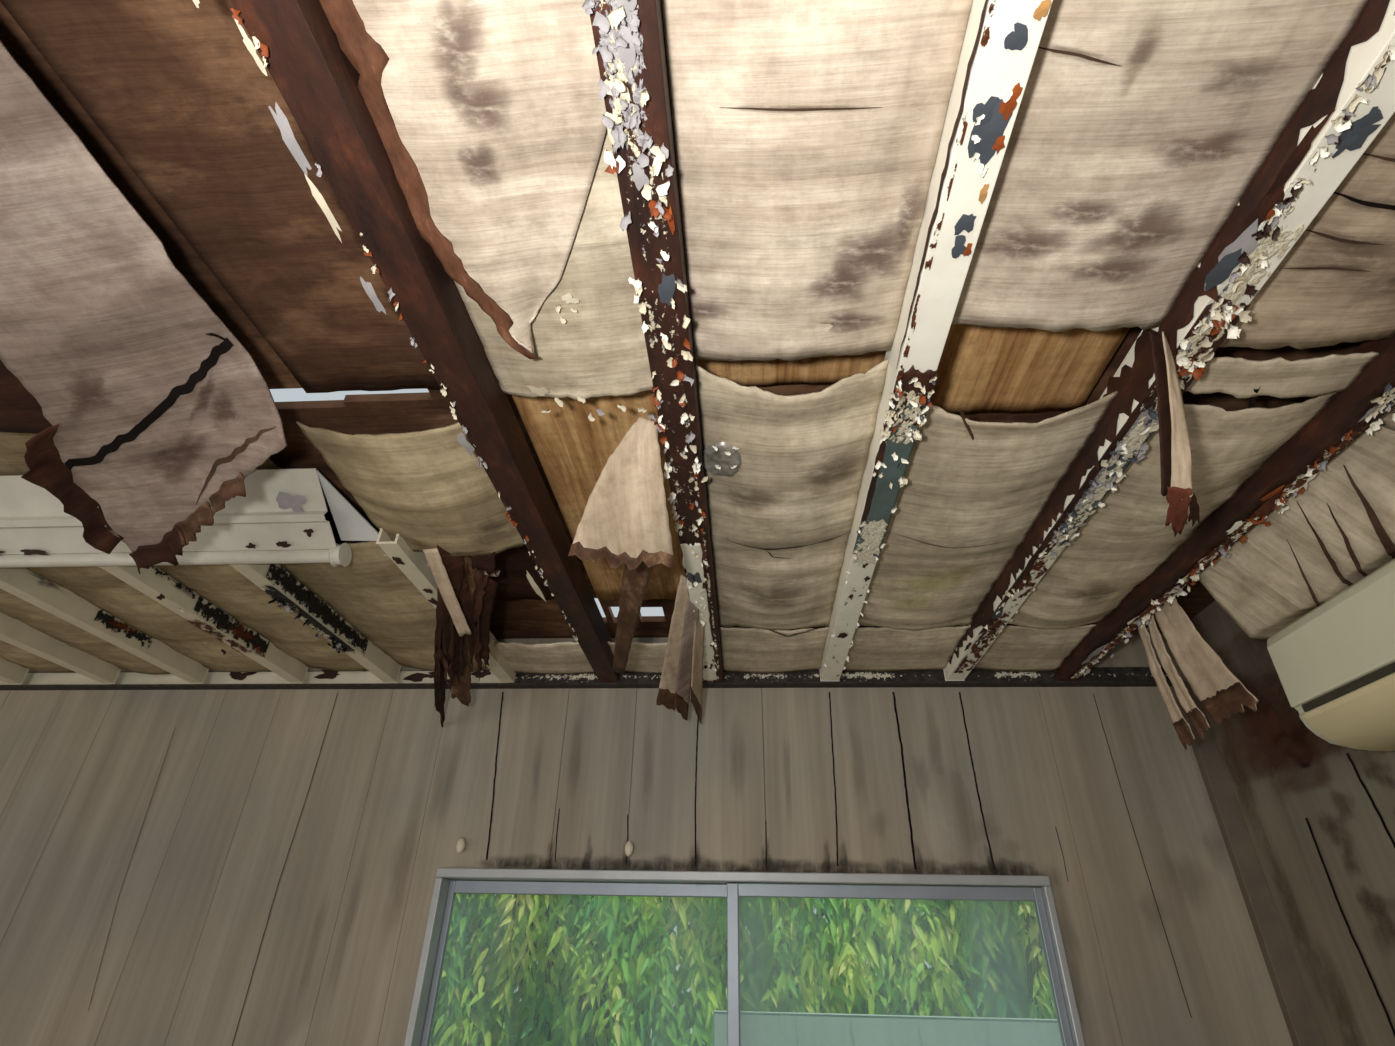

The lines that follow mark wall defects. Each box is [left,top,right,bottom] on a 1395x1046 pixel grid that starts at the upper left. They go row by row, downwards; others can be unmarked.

peeling [980,0,1028,51]
peeling [268,103,342,243]
peeling [925,83,1023,270]
peeling [1175,45,1395,395]
peeling [515,0,937,682]
crack [1287,465,1395,607]
rust [94,610,152,648]
rust [152,566,270,680]
rust [314,670,340,679]
rust [403,672,450,683]
leakage [1227,677,1298,769]
leakage [687,856,804,872]